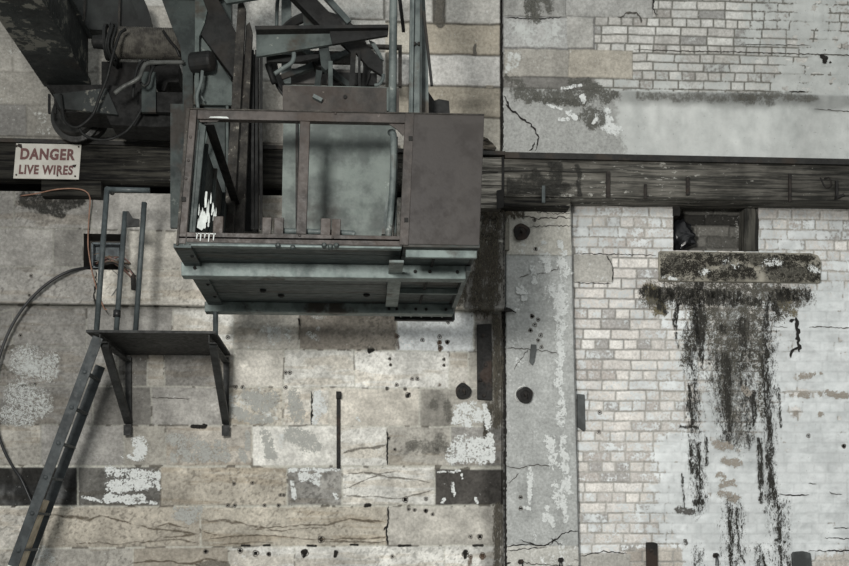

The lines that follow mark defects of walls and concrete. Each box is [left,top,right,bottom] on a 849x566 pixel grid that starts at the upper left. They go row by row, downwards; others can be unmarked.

water stain [524,0,552,24]
crack [482,0,606,173]
peeling [592,106,623,136]
crack [634,44,849,56]
crack [575,253,655,284]
water stain [457,210,525,438]
peeling [81,436,162,505]
peeling [437,401,495,504]
peeling [515,240,574,528]
crack [502,229,627,566]
water stain [638,269,815,566]
water stain [492,502,503,566]